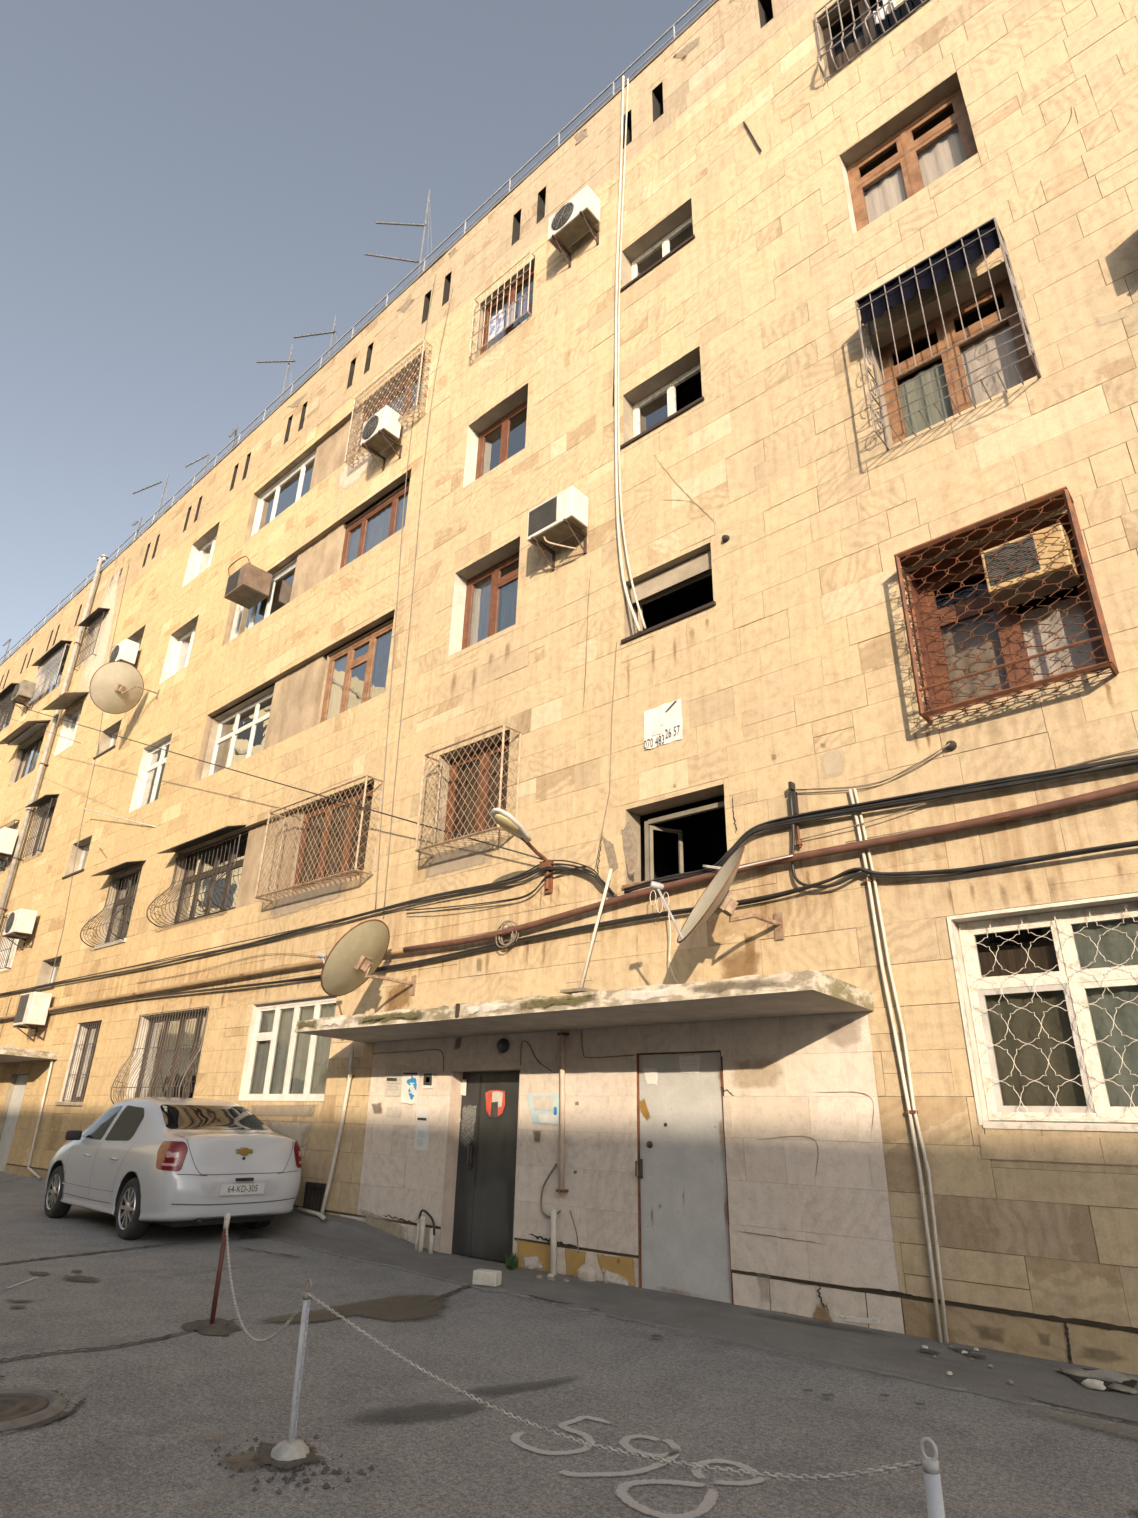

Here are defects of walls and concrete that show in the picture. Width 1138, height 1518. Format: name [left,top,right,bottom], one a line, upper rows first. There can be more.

flaking render [517,1239,635,1286]